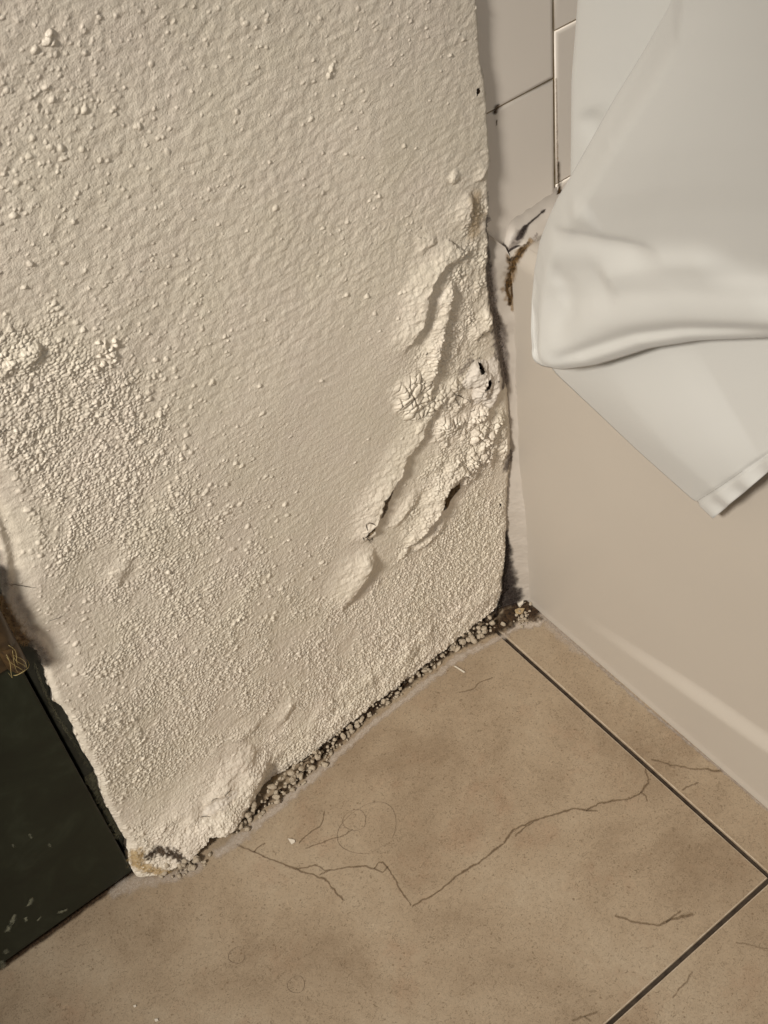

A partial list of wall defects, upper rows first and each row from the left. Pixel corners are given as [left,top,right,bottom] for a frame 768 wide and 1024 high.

rust [502,239,533,310]
peeling [347,367,509,560]
flaking render [235,602,533,833]
crack [236,759,721,906]
crack [616,911,693,926]